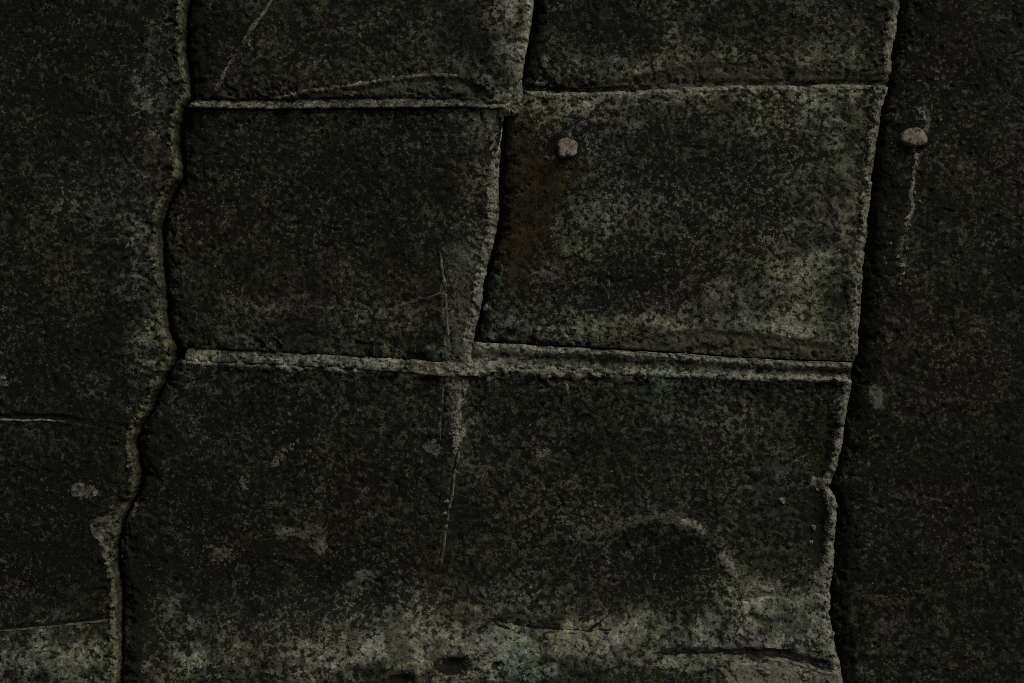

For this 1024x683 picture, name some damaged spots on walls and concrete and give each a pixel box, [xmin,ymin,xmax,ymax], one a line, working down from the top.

crack [407,251,461,564]